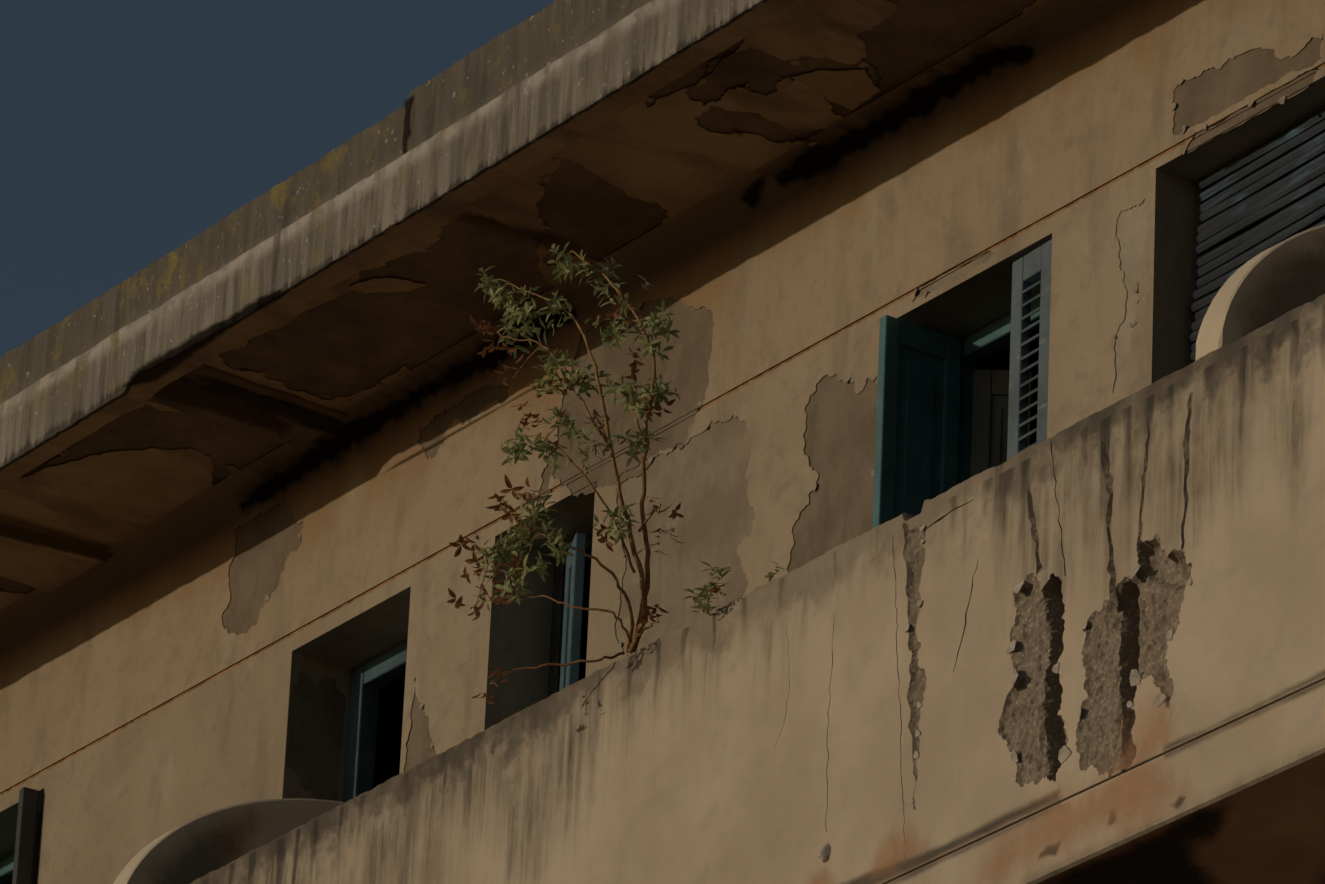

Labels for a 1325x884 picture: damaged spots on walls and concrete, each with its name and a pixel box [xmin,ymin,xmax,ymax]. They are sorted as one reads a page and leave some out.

water stain [742,46,1033,207]
peeling [1172,35,1323,156]
flaking render [218,158,668,400]
peeling [222,500,304,635]
water stain [123,290,576,509]
crack [825,614,835,833]
peeling [787,374,877,572]
crack [893,499,978,871]
crack [1027,439,1066,576]
spalling [998,534,1193,787]
crack [1101,417,1150,610]
crack [1180,392,1194,551]